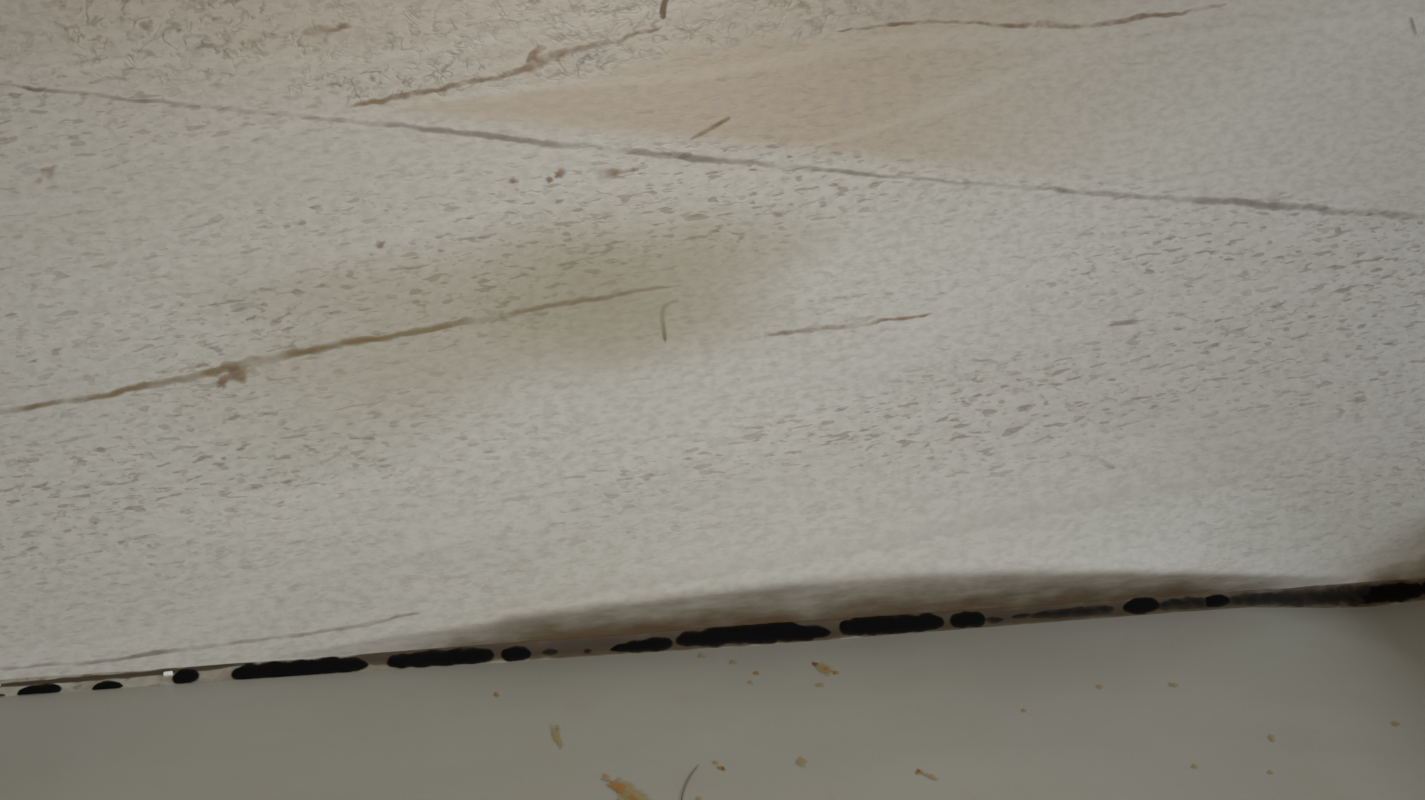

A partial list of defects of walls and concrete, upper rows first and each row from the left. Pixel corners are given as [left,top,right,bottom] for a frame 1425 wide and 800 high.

crack [659,0,667,18]
crack [1130,12,1170,20]
crack [360,85,449,105]
crack [515,293,625,313]
crack [289,323,454,357]
crack [203,367,235,375]
crack [90,383,148,399]
crack [26,401,55,410]
damp [0,575,1425,696]